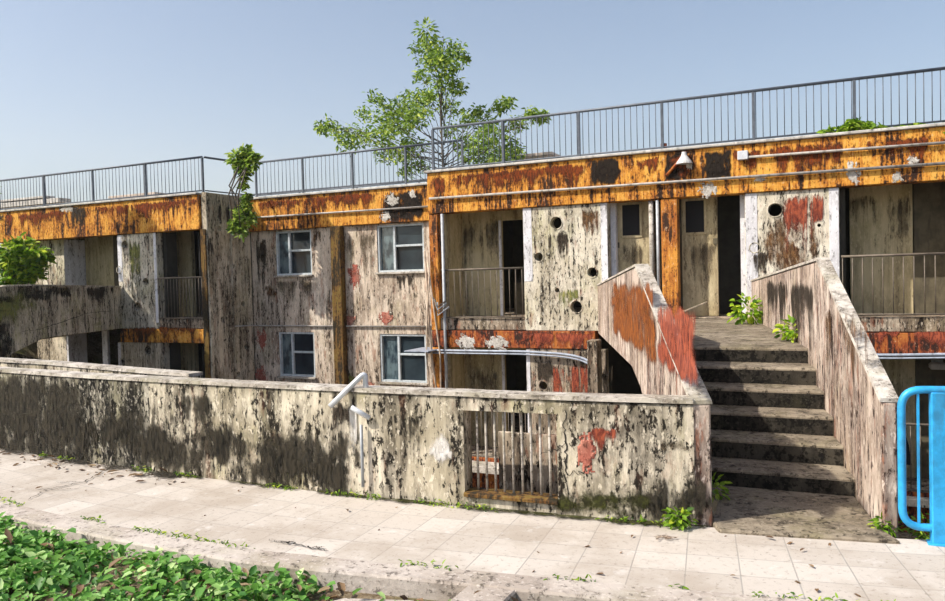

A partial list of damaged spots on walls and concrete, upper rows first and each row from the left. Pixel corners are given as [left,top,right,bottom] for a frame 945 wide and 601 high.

rust [434,164,588,197]
rust [628,155,692,180]
rust [733,144,855,179]
rust [867,137,928,160]
rust [93,199,196,222]
rust [259,193,375,213]
peeling [379,189,416,222]
damp [548,232,568,258]
damp [0,282,113,304]
damp [0,321,14,358]
damp [0,374,360,494]
peeling [578,432,596,474]